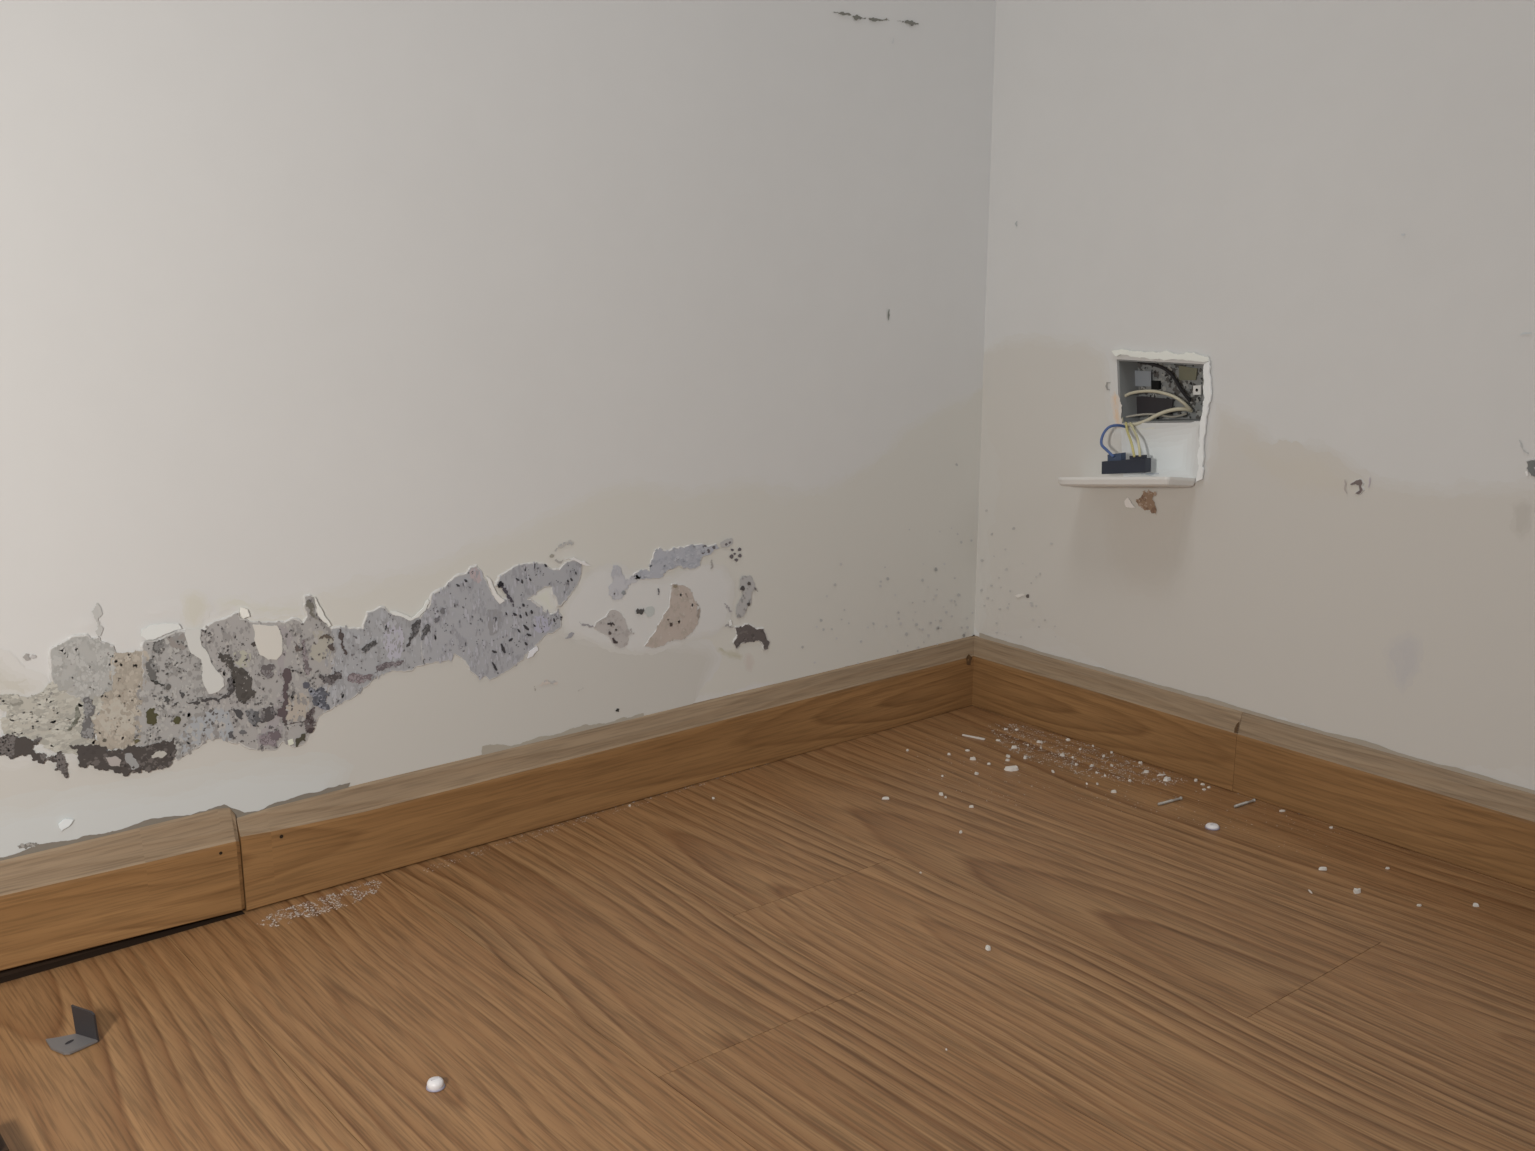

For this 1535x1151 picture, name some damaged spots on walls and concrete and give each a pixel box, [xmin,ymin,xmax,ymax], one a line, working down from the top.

flaking render [1112,349,1212,514]
spalling [1525,459,1535,477]
peeling [0,538,770,761]